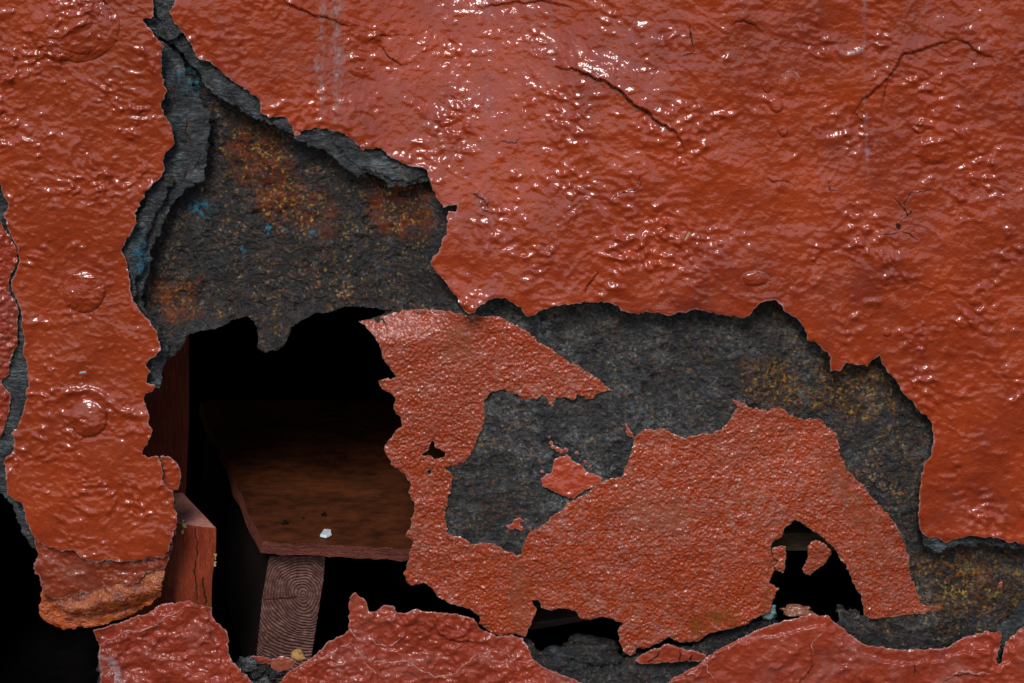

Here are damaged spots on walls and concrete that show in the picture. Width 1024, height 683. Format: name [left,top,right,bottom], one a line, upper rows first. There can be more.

crack [283,0,408,65]
crack [557,66,685,151]
crack [853,39,993,127]
spalling [121,0,430,399]
corrosion [141,26,1024,650]
peeling [548,436,592,468]
peeling [506,518,524,531]
peeling [771,545,787,573]
peeling [802,540,831,576]
spalling [918,524,1024,554]
spalling [994,596,1024,649]